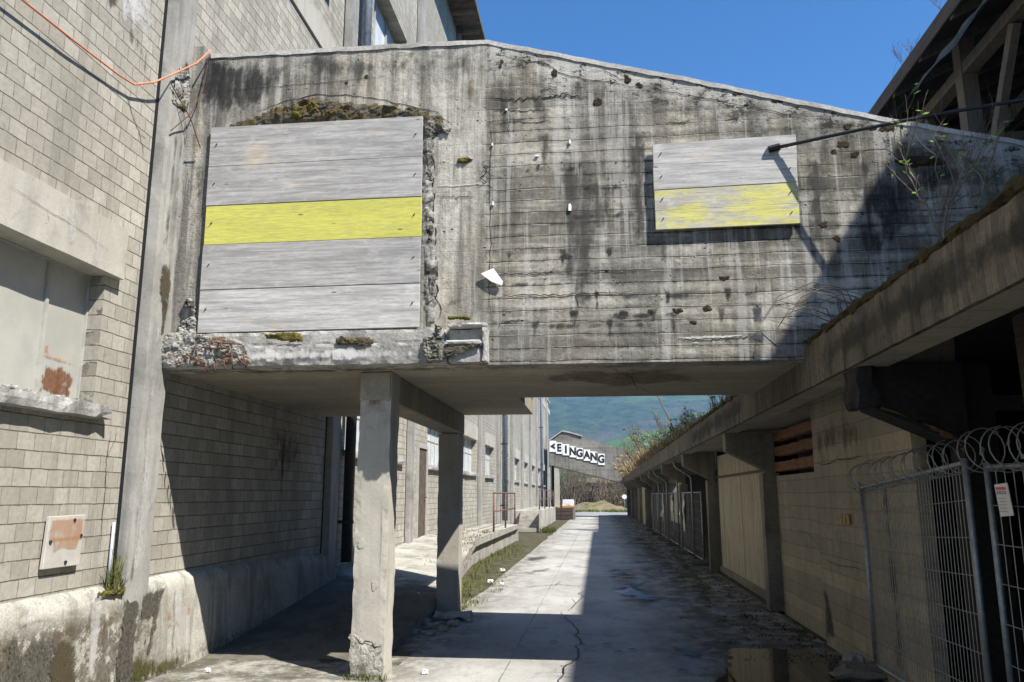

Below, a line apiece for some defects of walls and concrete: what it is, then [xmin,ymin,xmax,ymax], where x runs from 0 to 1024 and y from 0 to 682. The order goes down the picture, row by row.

spalling [172,62,192,111]
water stain [632,135,645,231]
spalling [229,97,481,364]
water stain [561,162,609,324]
rust [40,346,72,396]
spalling [161,297,252,372]
rust [51,519,82,548]
water stain [49,642,82,682]
water stain [118,587,166,682]
spalling [348,633,385,677]
crack [524,582,585,682]